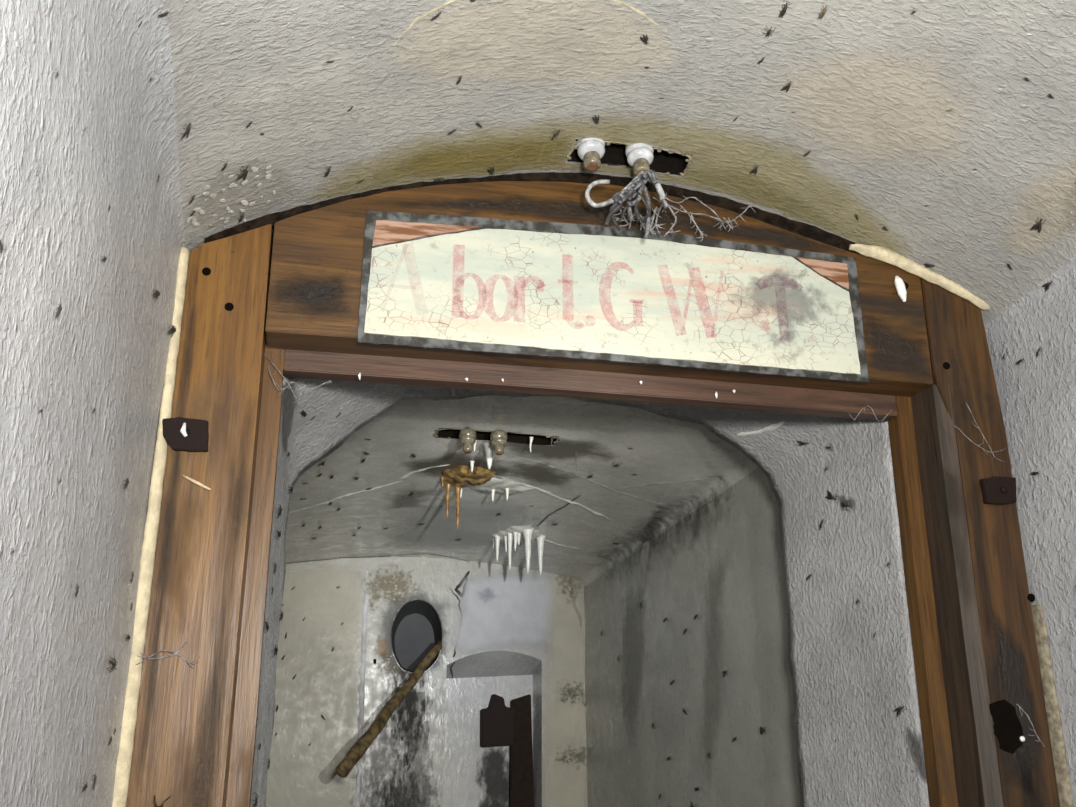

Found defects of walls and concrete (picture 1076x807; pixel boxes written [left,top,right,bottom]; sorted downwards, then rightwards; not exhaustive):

leakage [402,199,819,250]
leakage [288,437,671,578]
crack [537,495,581,527]